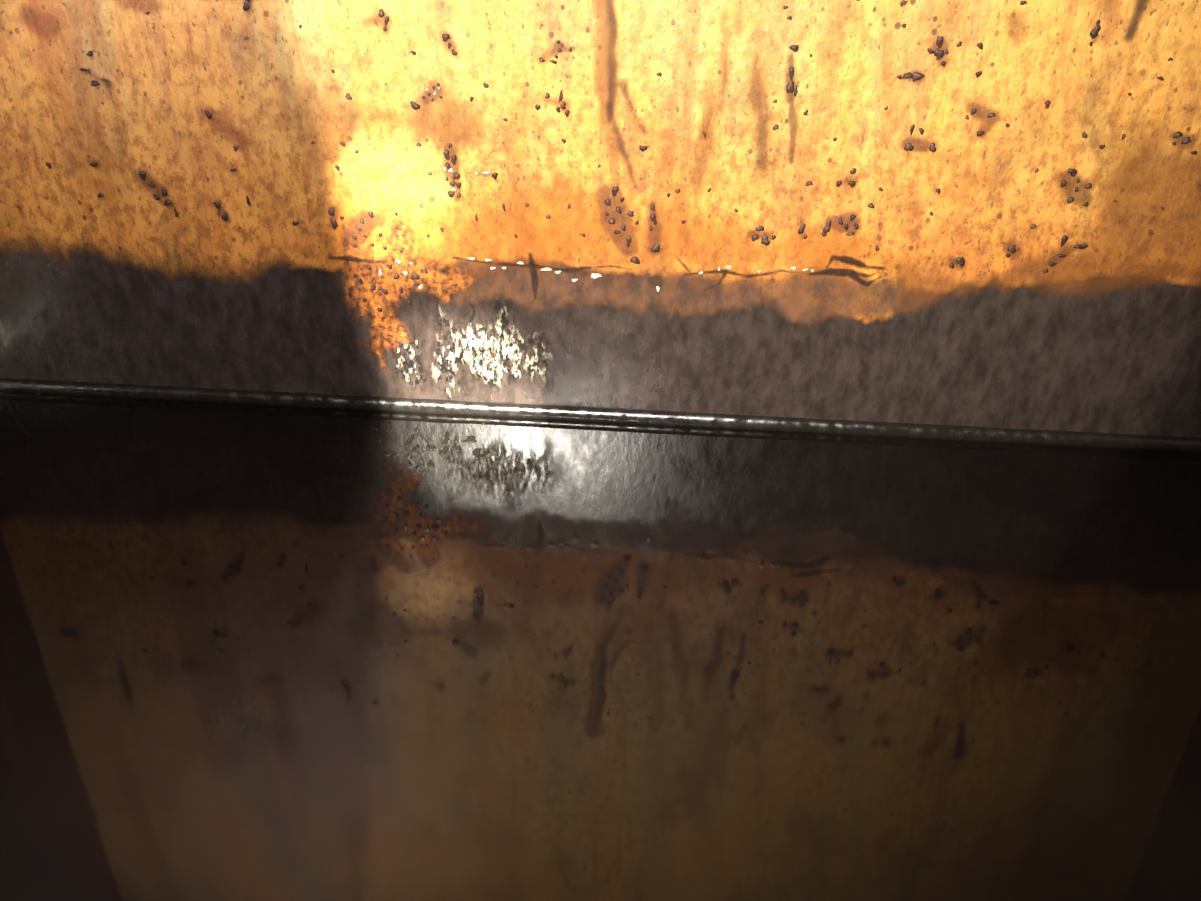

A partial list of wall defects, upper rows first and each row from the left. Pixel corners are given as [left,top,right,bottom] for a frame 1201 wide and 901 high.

crack [453,254,589,298]
crack [683,265,768,281]
crack [810,256,884,286]
damp [0,244,1201,438]